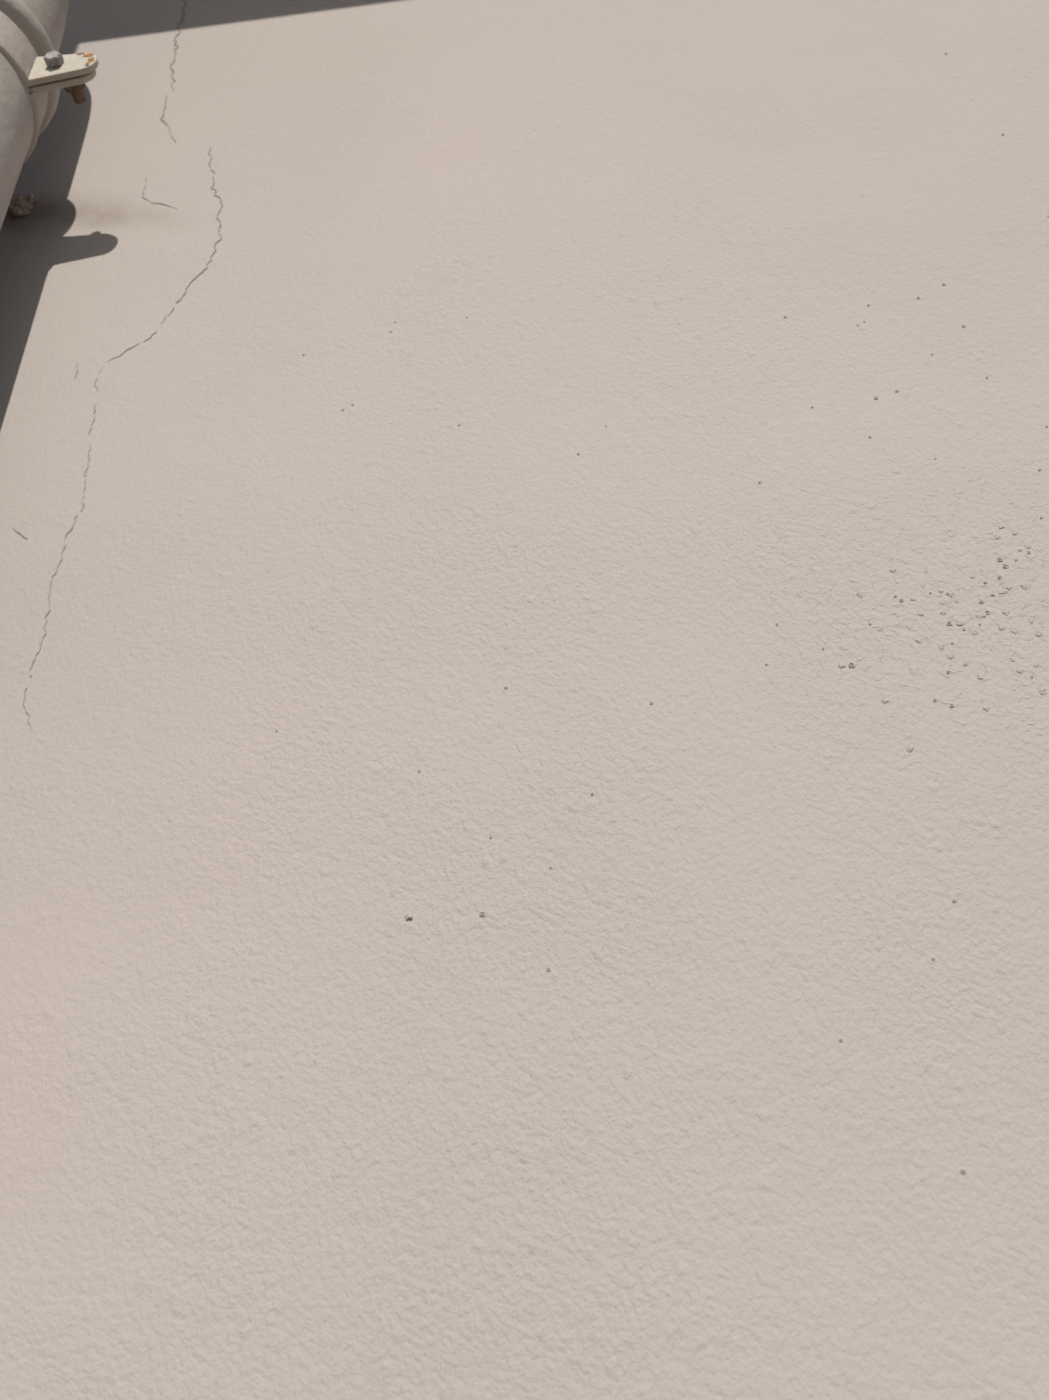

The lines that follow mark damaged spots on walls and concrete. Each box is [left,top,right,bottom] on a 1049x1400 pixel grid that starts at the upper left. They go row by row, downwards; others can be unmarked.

crack [160,0,187,142]
crack [23,149,223,728]